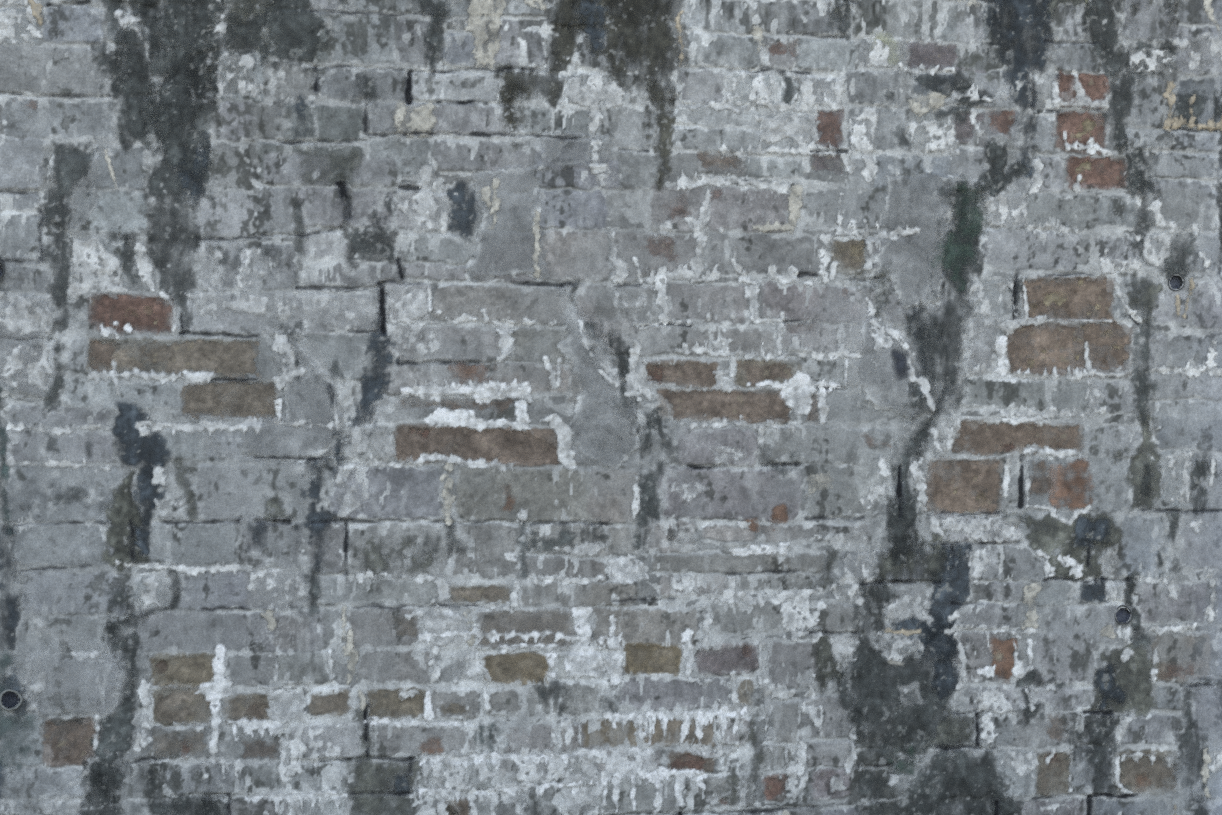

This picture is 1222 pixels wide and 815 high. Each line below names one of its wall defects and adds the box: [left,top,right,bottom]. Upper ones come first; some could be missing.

spalling [1058,71,1123,186]
leakage [419,0,892,450]
peeling [88,283,342,463]
spalling [427,399,513,411]
spalling [394,426,558,464]
spalling [642,361,792,422]
leakage [670,0,1222,815]
spalling [926,422,1079,514]
spalling [1008,276,1130,373]
leakage [485,462,662,613]
spalling [150,654,214,722]
spalling [371,691,424,716]